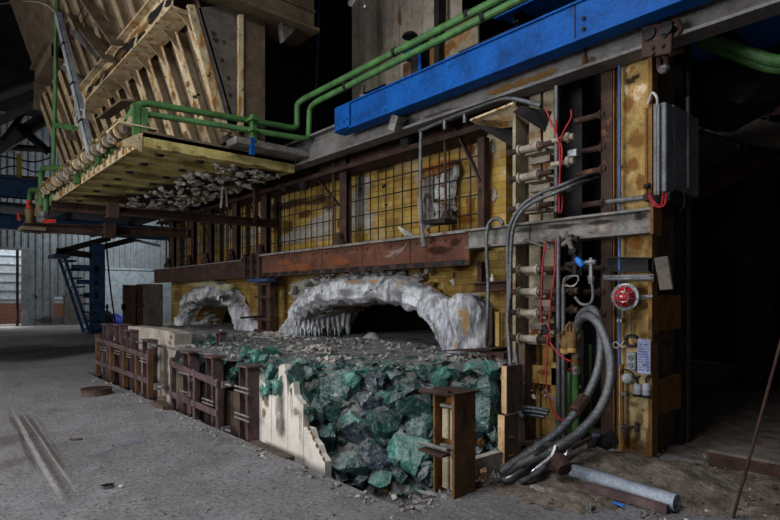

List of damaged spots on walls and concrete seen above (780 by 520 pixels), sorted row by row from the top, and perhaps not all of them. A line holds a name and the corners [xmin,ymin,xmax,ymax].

spalling [434,164,459,219]
leakage [276,209,332,245]